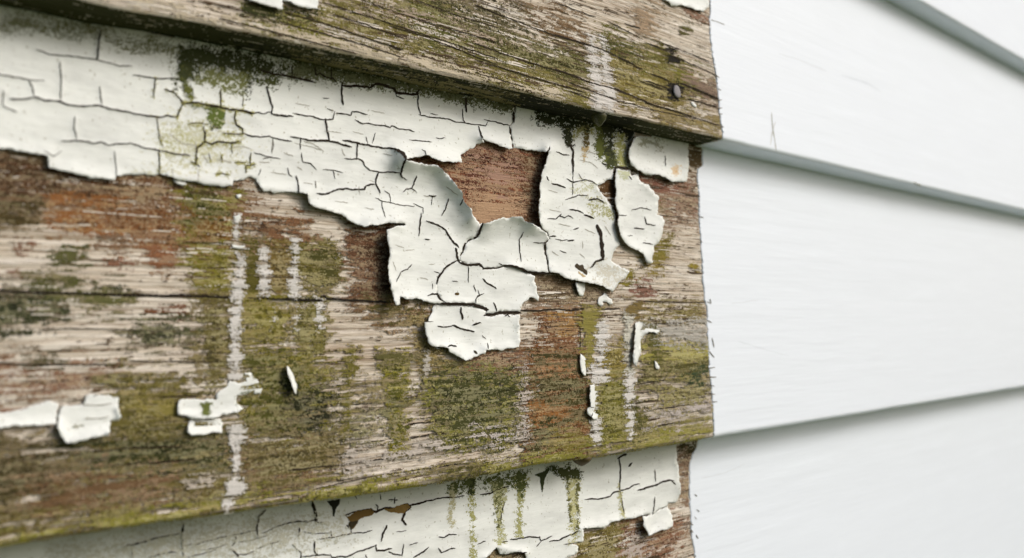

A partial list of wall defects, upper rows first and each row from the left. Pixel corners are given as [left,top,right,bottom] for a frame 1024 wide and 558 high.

crack [219,0,720,126]
damp [584,31,620,114]
peeling [0,5,689,366]
crack [38,325,144,333]
damp [0,148,278,381]
crack [0,276,393,303]
damp [336,218,432,338]
crack [521,300,706,350]
peeling [0,394,121,443]
peeling [177,372,262,436]
damp [0,267,713,558]
peeling [0,443,681,558]